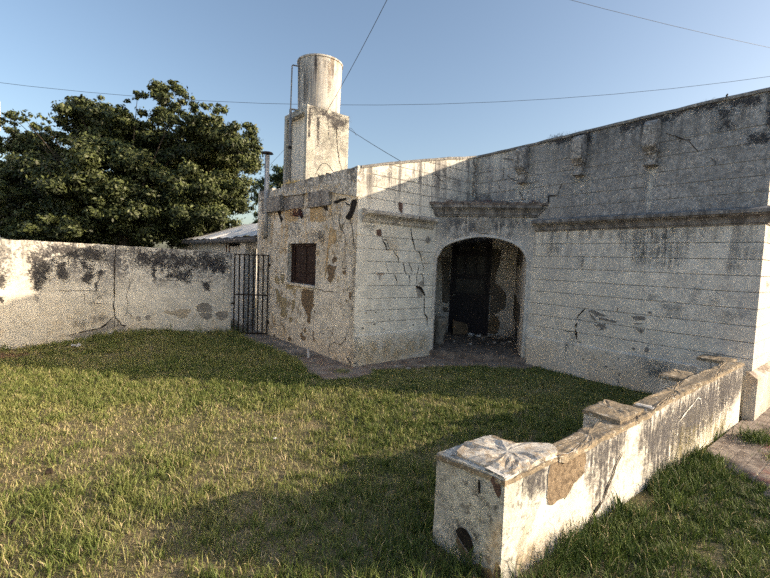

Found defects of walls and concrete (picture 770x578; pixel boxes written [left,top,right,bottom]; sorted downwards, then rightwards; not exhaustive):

damp [308,106,348,146]
damp [26,243,107,299]
crack [56,245,196,336]
damp [128,244,228,292]
flaking render [162,302,229,321]
spalling [273,273,333,342]
spalling [278,198,357,284]
crack [382,231,428,323]
flaking render [488,248,524,334]
damp [640,368,743,481]
spalling [546,449,587,505]
damp [585,431,627,506]